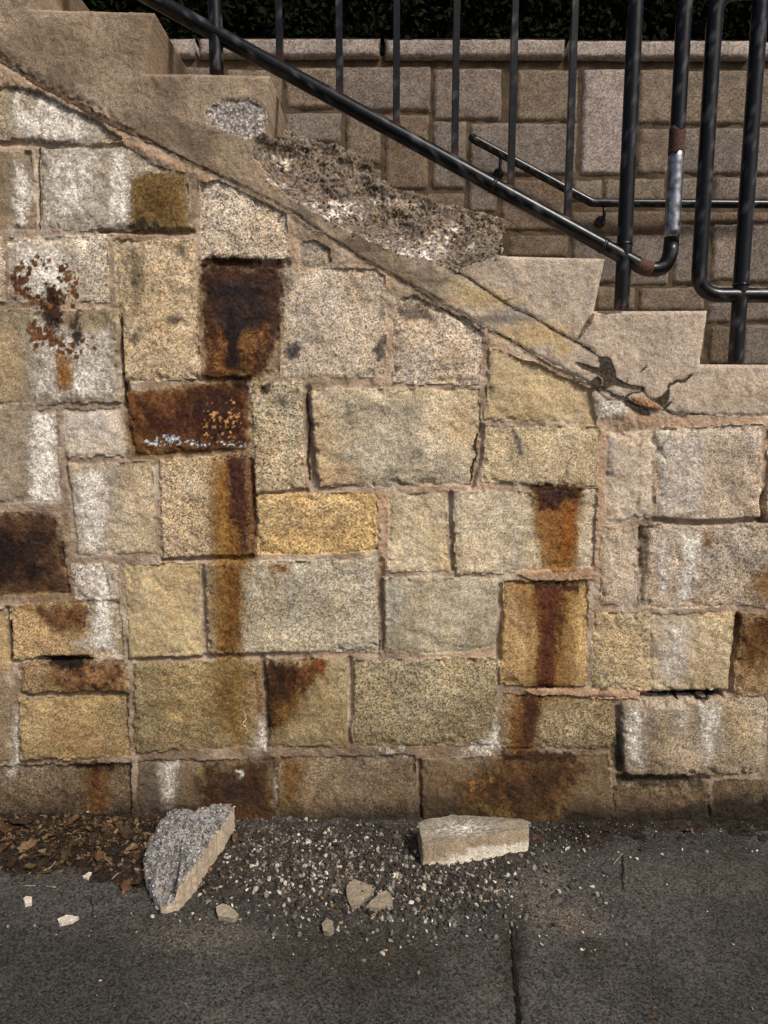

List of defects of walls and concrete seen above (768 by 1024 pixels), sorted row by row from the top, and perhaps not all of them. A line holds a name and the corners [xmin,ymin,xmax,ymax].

corrosion [11,255,100,390]
spalling [202,96,507,273]
crack [0,58,717,416]
corrosion [0,512,93,633]
corrosion [45,655,128,694]
corrosion [124,254,330,745]
corrosion [463,480,590,822]
corrosion [733,565,768,671]